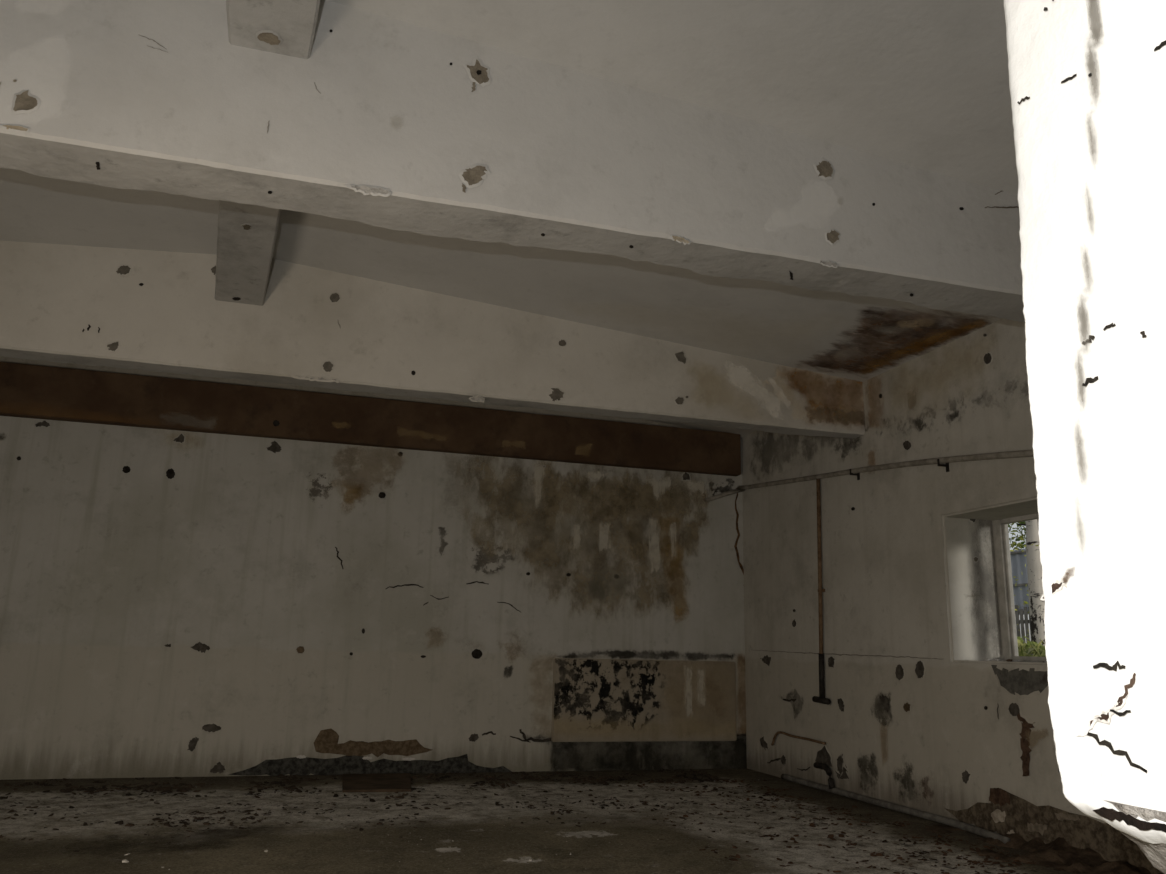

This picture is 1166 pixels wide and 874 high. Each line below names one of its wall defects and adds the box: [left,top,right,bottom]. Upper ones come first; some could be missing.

spalling [463,55,492,92]
spalling [0,79,41,133]
crack [734,488,744,575]
peeling [554,659,662,728]
spalling [991,665,1048,776]
spalling [207,728,523,776]
crack [1087,732,1147,773]
spalling [945,788,1162,874]
crack [1093,807,1166,832]